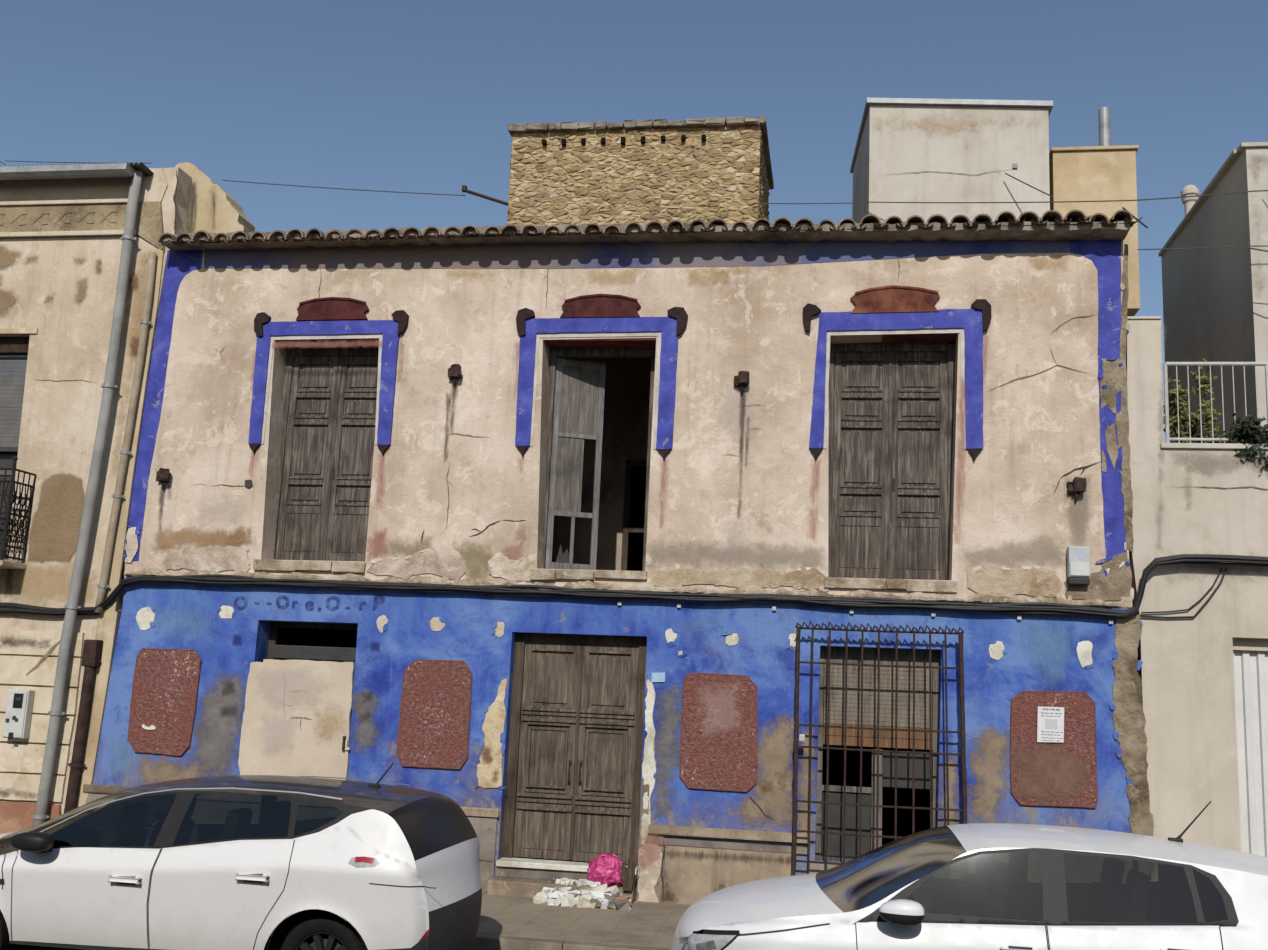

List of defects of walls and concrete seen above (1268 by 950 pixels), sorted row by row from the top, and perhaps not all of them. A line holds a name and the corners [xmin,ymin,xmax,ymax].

flaking render [0,245,35,268]
flaking render [0,290,16,315]
crack [989,314,1095,390]
crack [419,420,523,542]
peeling [123,525,141,563]
leakage [155,486,245,550]
flaking render [367,548,466,580]
flaking render [486,552,534,583]
flaking render [967,244,1154,836]
leakage [222,683,236,715]
peeling [473,678,507,789]
peeling [615,671,682,902]